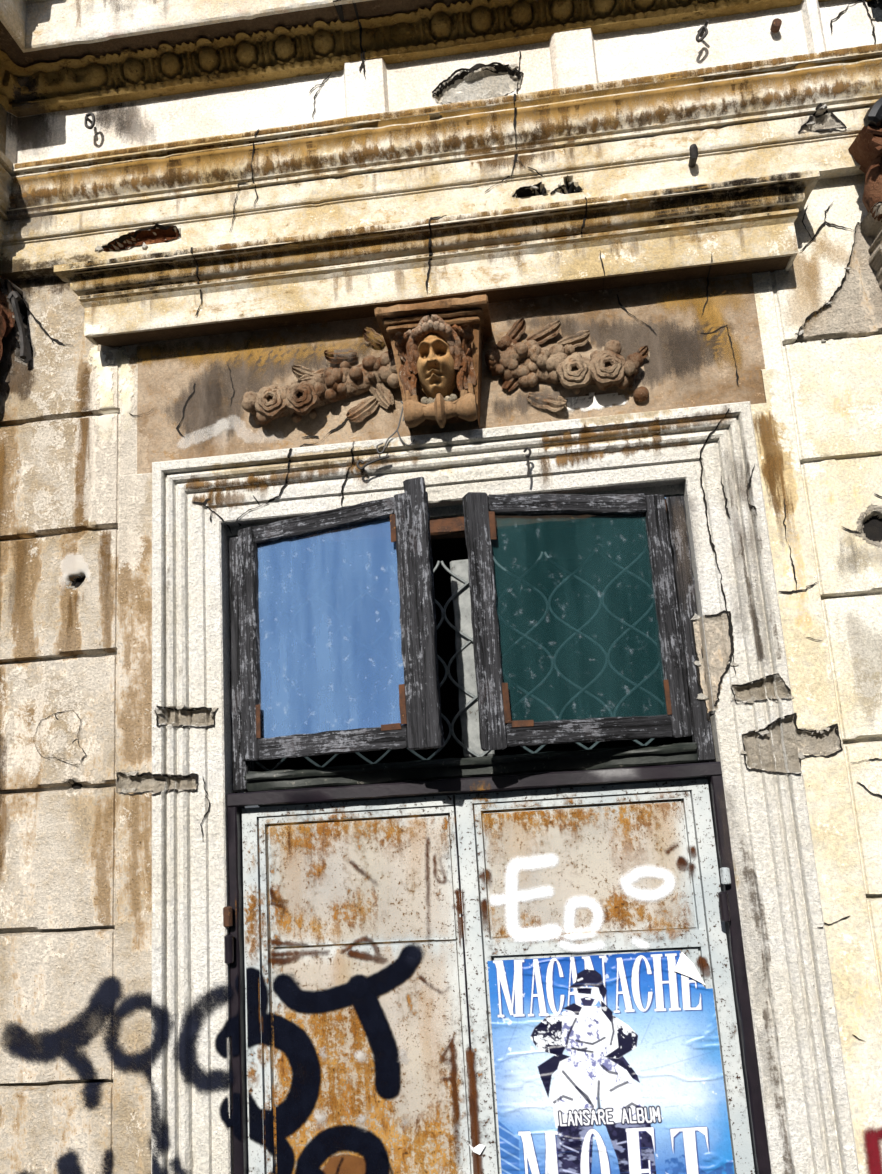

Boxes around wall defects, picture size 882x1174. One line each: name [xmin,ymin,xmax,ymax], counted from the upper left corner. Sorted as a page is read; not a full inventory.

crack [309,0,366,117]
water stain [6,43,882,228]
crack [801,202,852,251]
crack [699,255,821,675]
water stain [753,412,789,510]
water stain [100,531,111,582]
flaking render [691,610,794,721]
spalling [740,713,843,775]
rust [478,786,676,845]
rust [235,861,385,965]
rust [262,811,465,944]
rust [248,1007,482,1174]